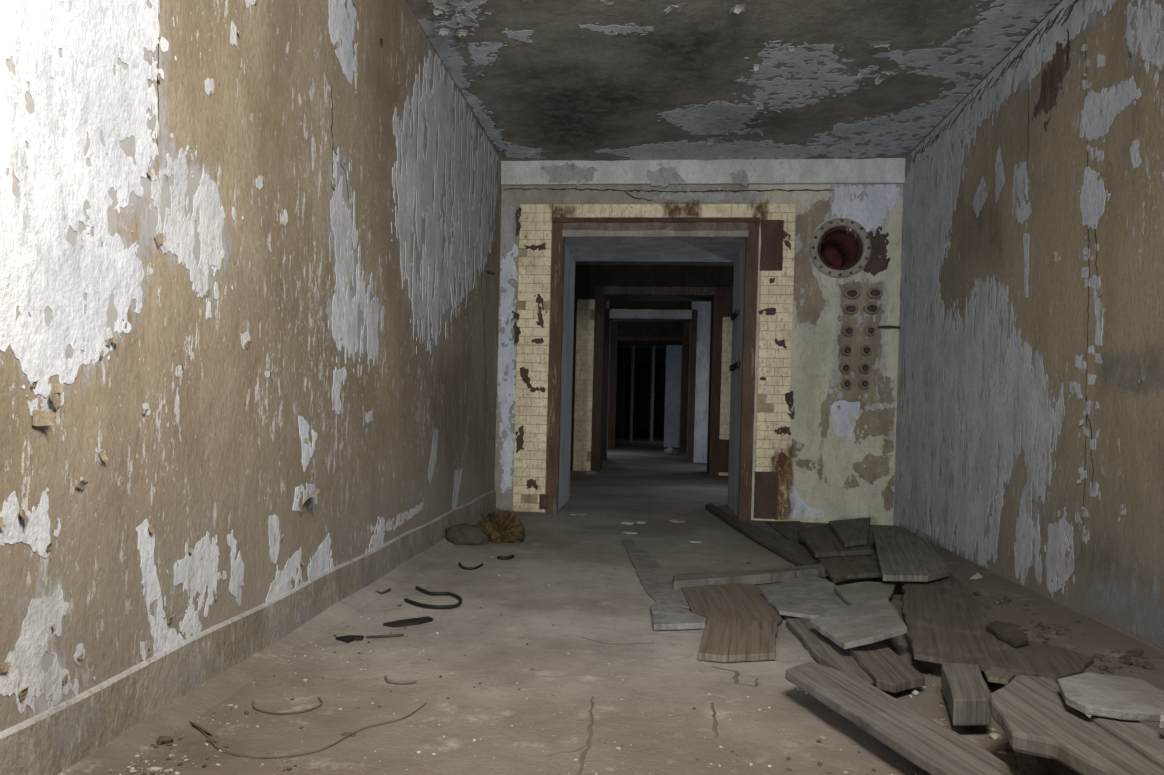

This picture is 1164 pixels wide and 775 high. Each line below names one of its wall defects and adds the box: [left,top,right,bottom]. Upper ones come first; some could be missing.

peeling [577,22,654,36]
peeling [0,0,244,426]
peeling [391,0,549,493]
peeling [595,0,1164,596]
peeling [0,488,61,558]
peeling [136,518,244,660]
peeling [266,514,334,603]
peeling [293,416,320,515]
peeling [452,469,462,510]
corrosion [771,447,793,521]
peeling [0,579,96,716]
crack [550,696,594,775]